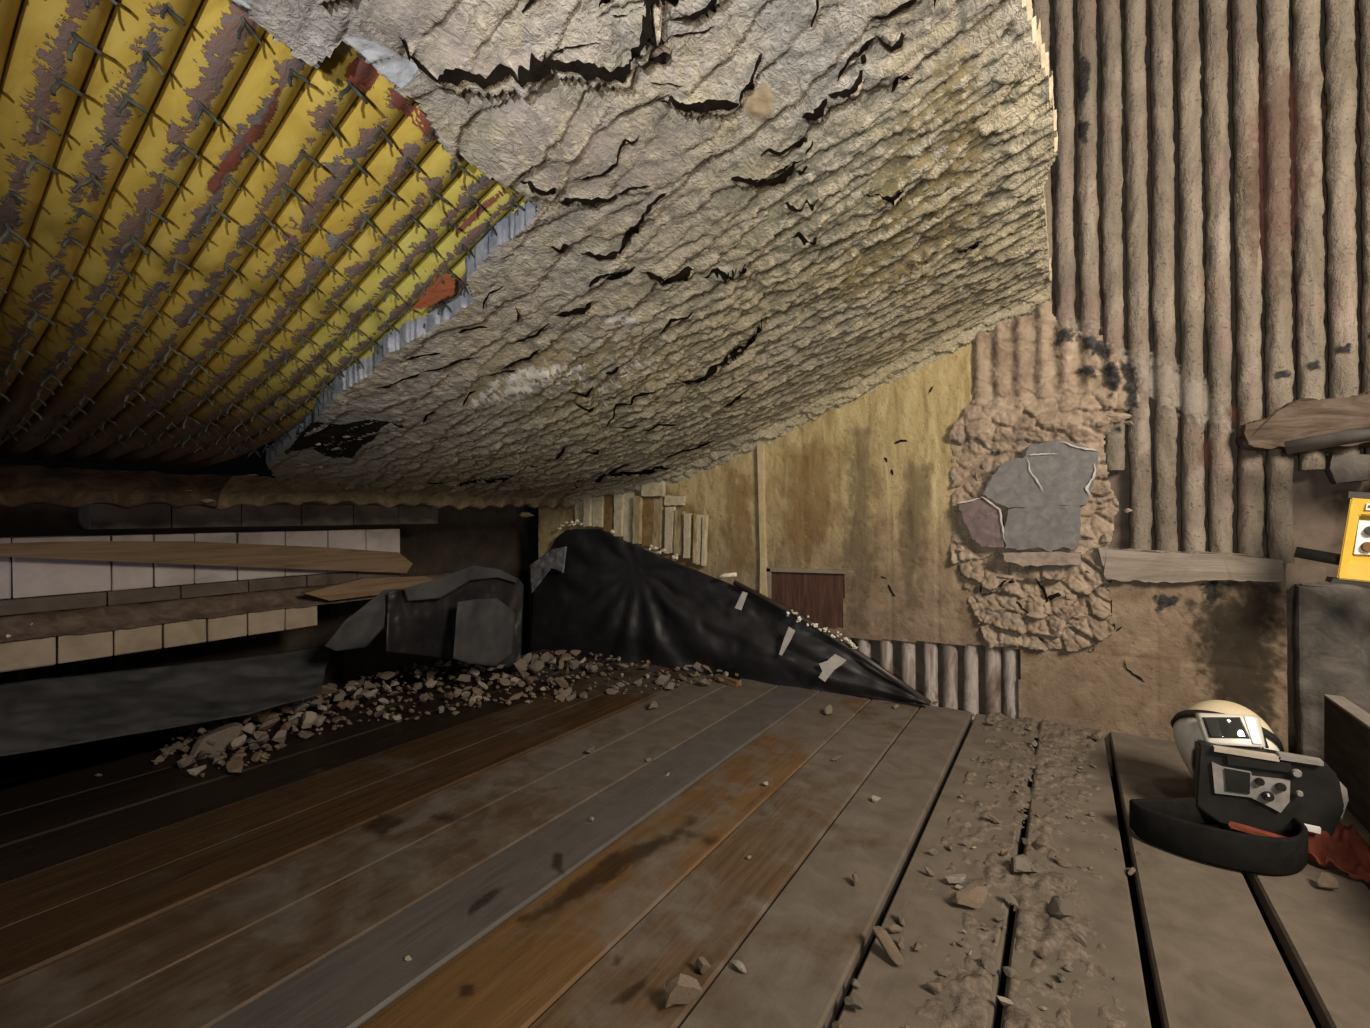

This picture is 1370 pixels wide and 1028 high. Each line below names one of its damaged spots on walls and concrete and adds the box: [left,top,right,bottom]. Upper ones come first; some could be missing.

spalling [342,35,418,89]
crack [399,0,762,114]
crack [731,0,936,246]
spalling [1022,0,1058,164]
spalling [266,186,538,481]
crack [375,136,747,428]
crack [428,319,766,494]
crack [956,241,983,253]
spalling [950,185,1141,652]